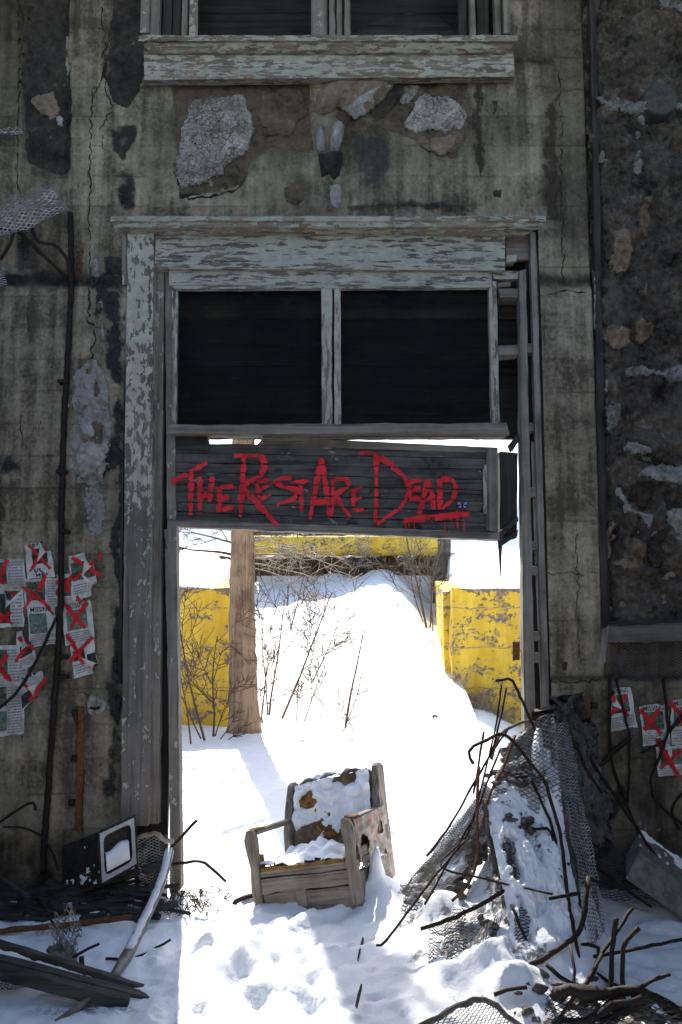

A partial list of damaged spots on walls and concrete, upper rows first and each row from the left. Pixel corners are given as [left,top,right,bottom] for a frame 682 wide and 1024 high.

flaking render [20,0,73,176]
crack [81,7,118,367]
peeling [103,0,144,108]
flaking render [175,84,314,199]
flaking render [337,83,468,159]
crack [547,72,589,295]
flaking render [66,359,112,485]
crack [546,527,606,684]